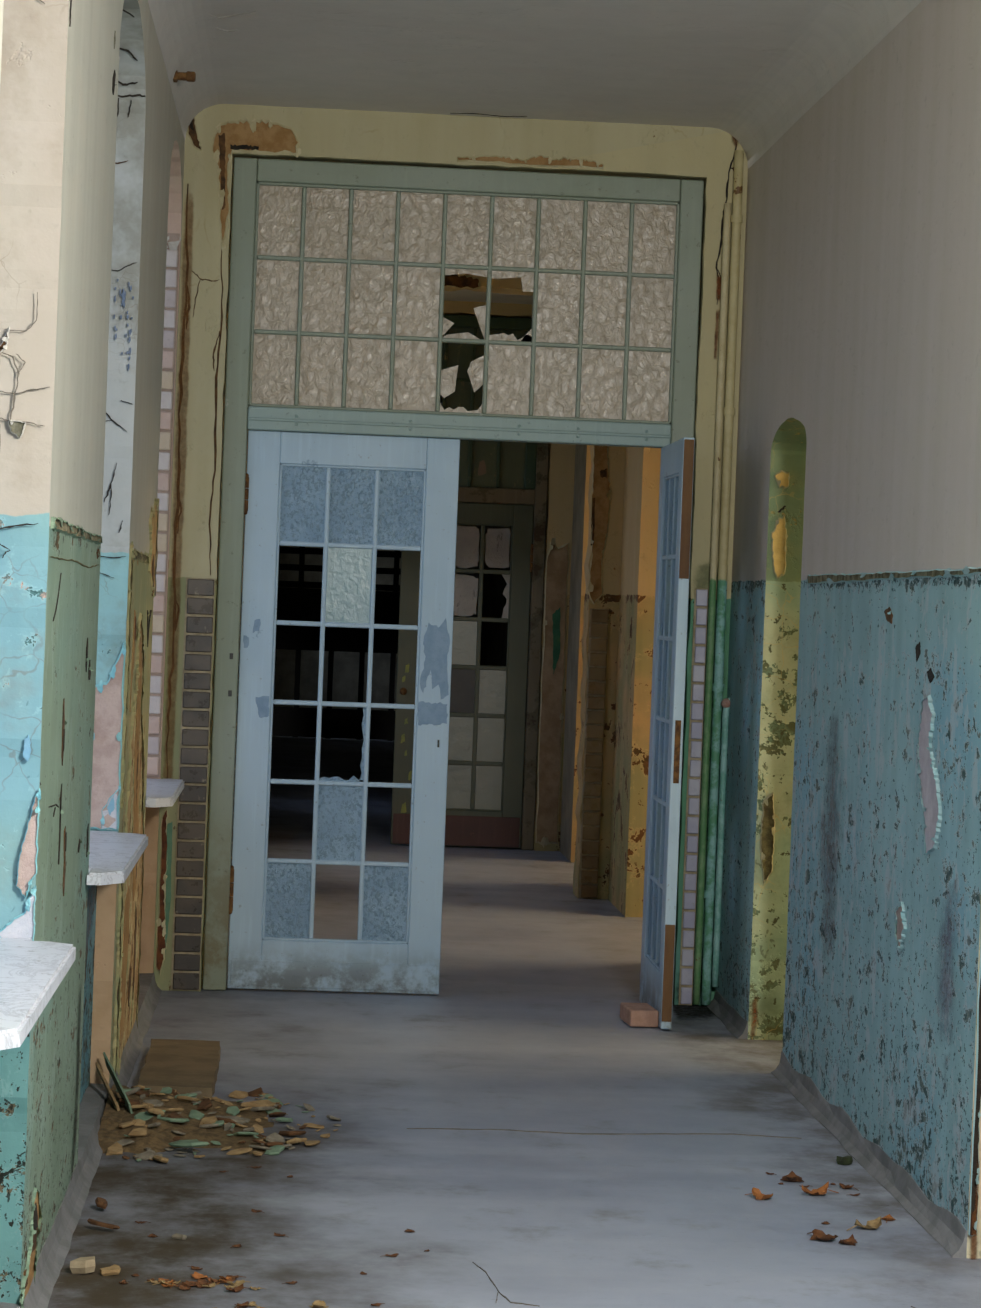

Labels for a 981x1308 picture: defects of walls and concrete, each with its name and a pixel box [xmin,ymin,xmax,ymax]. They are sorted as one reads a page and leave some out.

crack [40,0,72,27]
crack [117,48,146,117]
flaking render [188,117,301,251]
crack [0,292,49,445]
peeling [50,516,103,559]
crack [100,463,126,578]
flaking render [58,232,181,896]
flaking render [0,788,41,941]
peeling [760,792,776,884]
flaking render [112,808,173,1075]
peeling [968,945,981,1237]
crack [472,1262,540,1307]